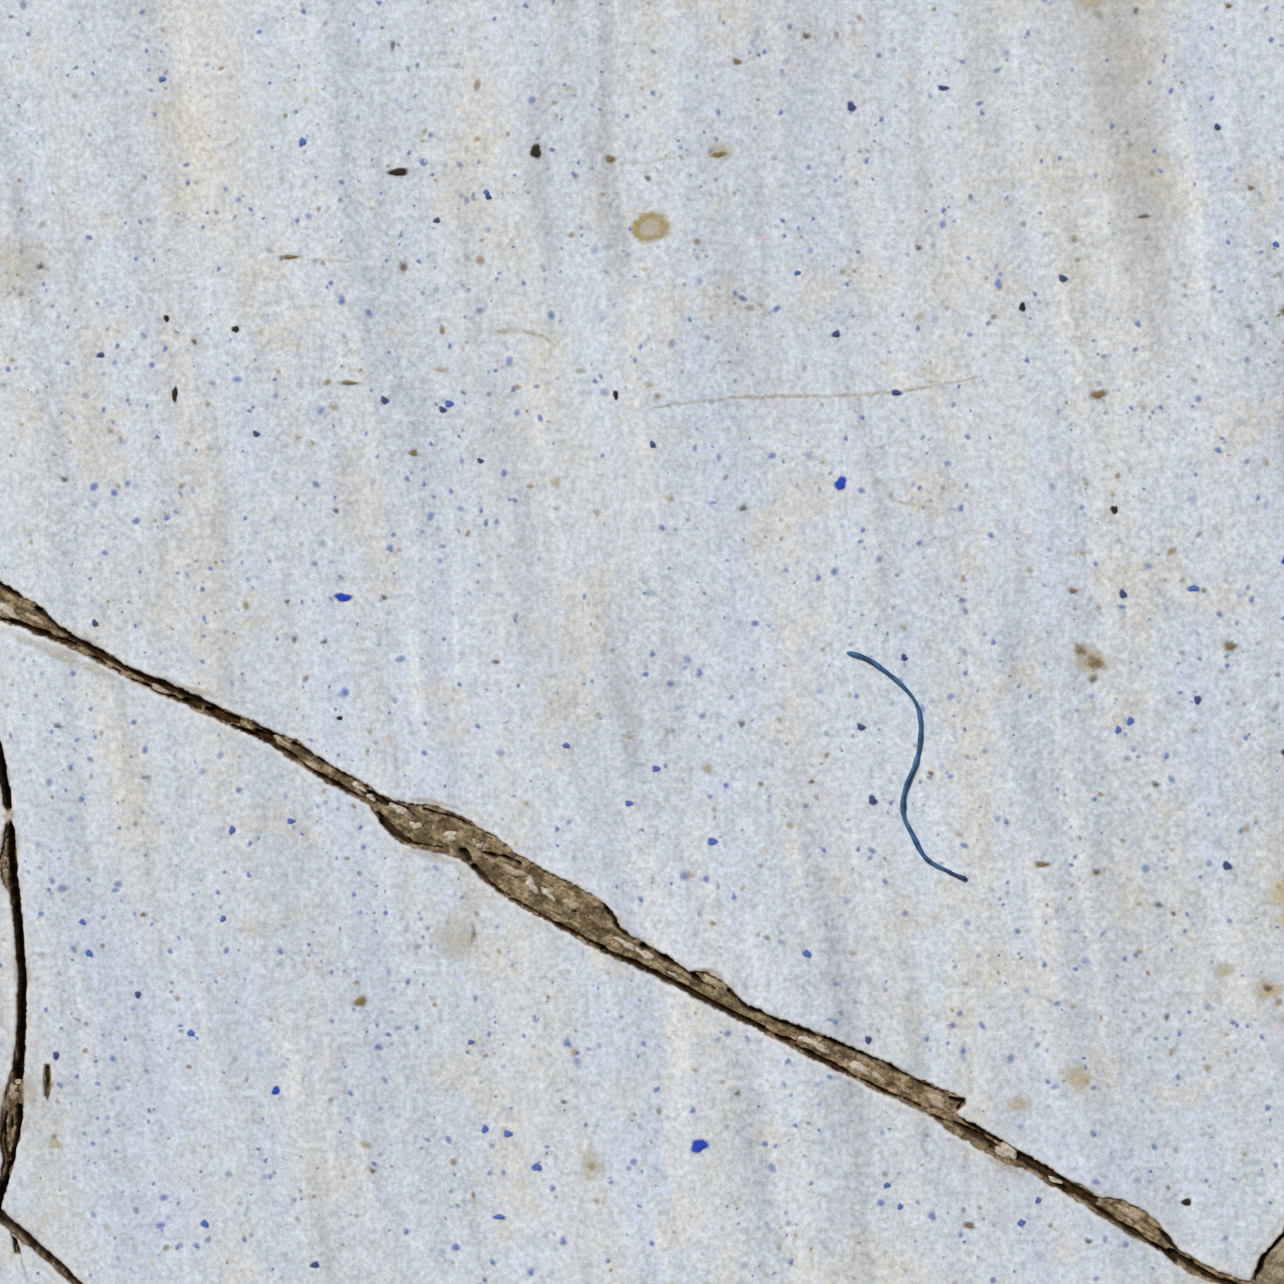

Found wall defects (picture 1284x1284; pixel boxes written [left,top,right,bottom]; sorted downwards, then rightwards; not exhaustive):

crack [0,581,1284,1284]